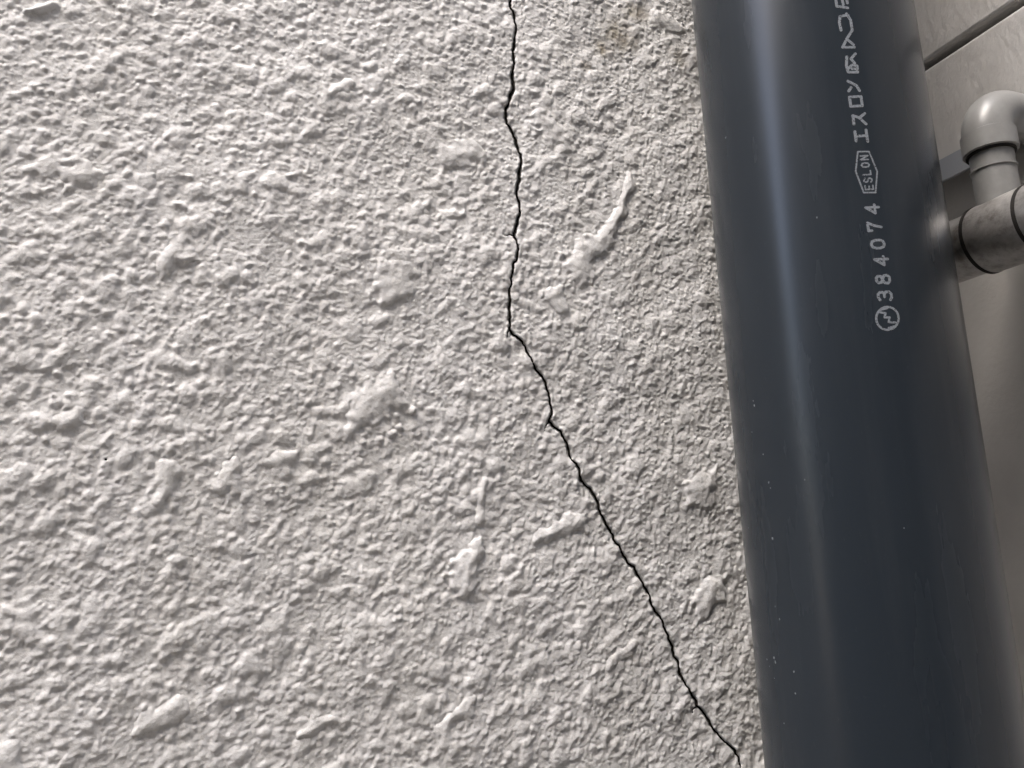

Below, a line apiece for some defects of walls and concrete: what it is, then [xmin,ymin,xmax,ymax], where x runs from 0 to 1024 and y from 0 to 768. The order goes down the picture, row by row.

crack [505,0,741,768]